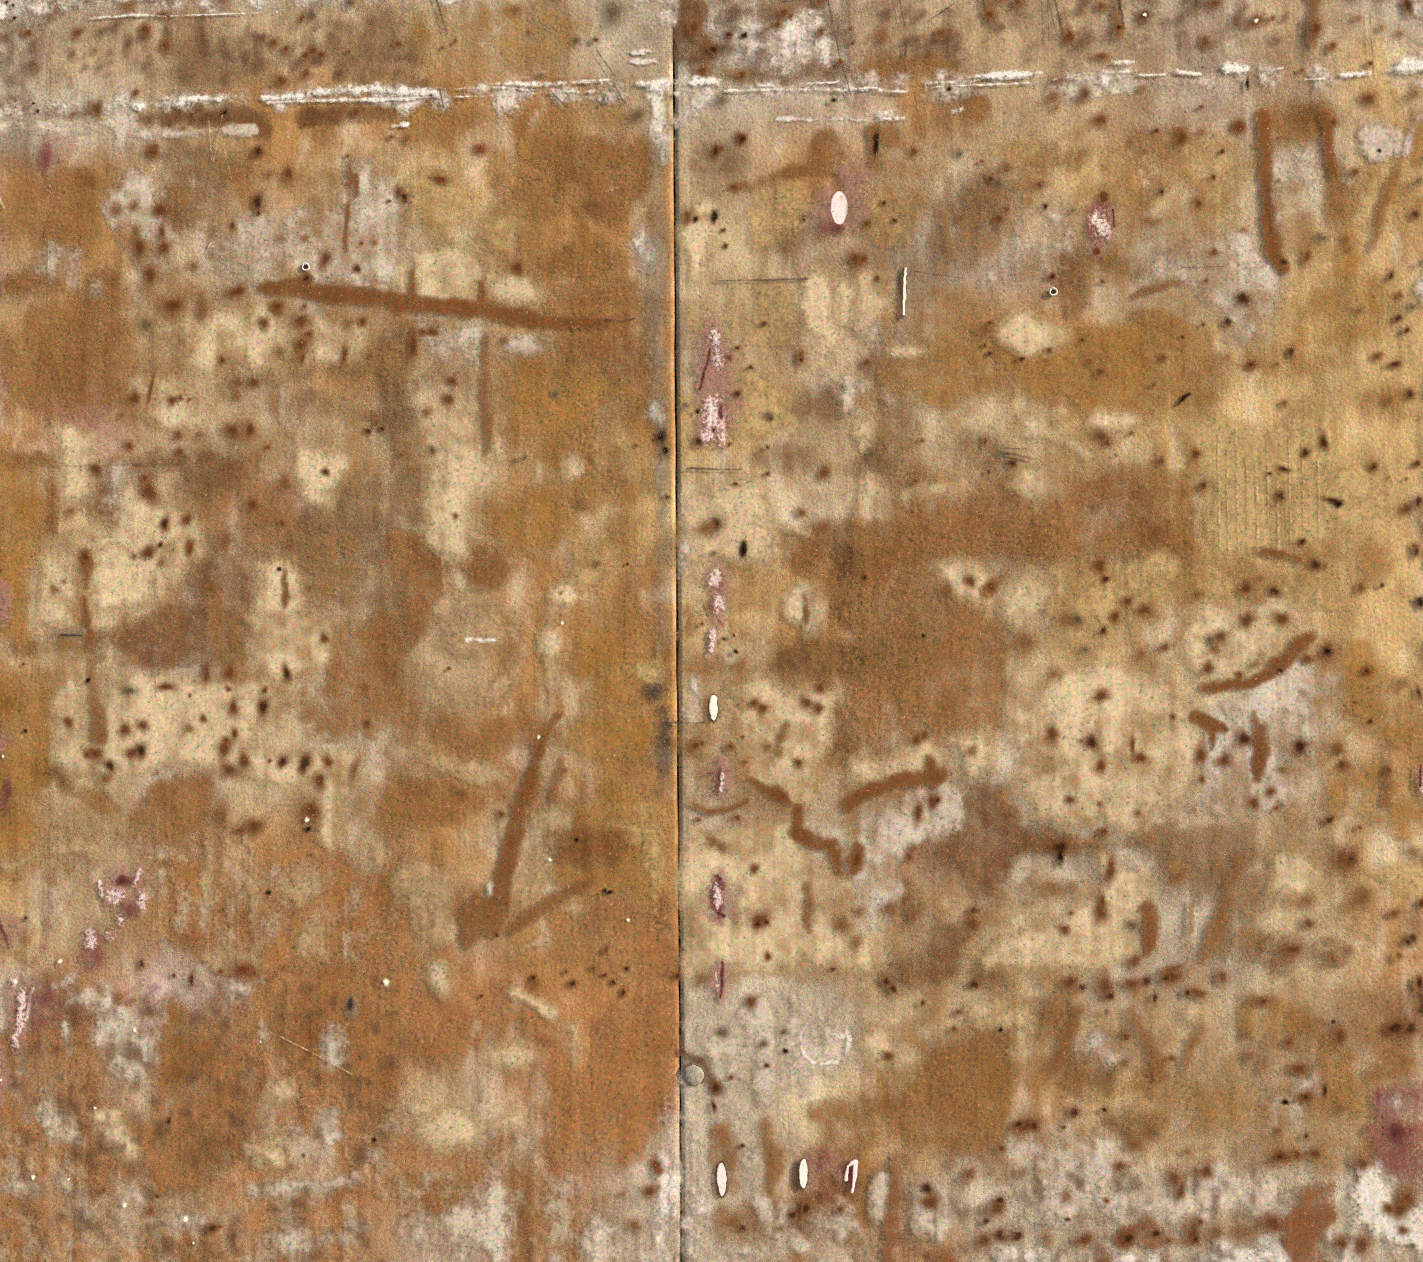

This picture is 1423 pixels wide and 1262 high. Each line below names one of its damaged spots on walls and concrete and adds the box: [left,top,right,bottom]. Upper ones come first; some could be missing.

peeling [0,94,258,149]
corrosion [70,1,623,86]
peeling [261,10,908,165]
peeling [634,0,678,26]
corrosion [665,0,991,126]
peeling [927,60,1249,112]
corrosion [48,89,293,285]
corrosion [0,154,1041,1262]
corrosion [882,766,1116,1006]
corrosion [1025,538,1423,1204]
corrosion [929,1162,1372,1262]
corrosion [1384,1183,1423,1249]